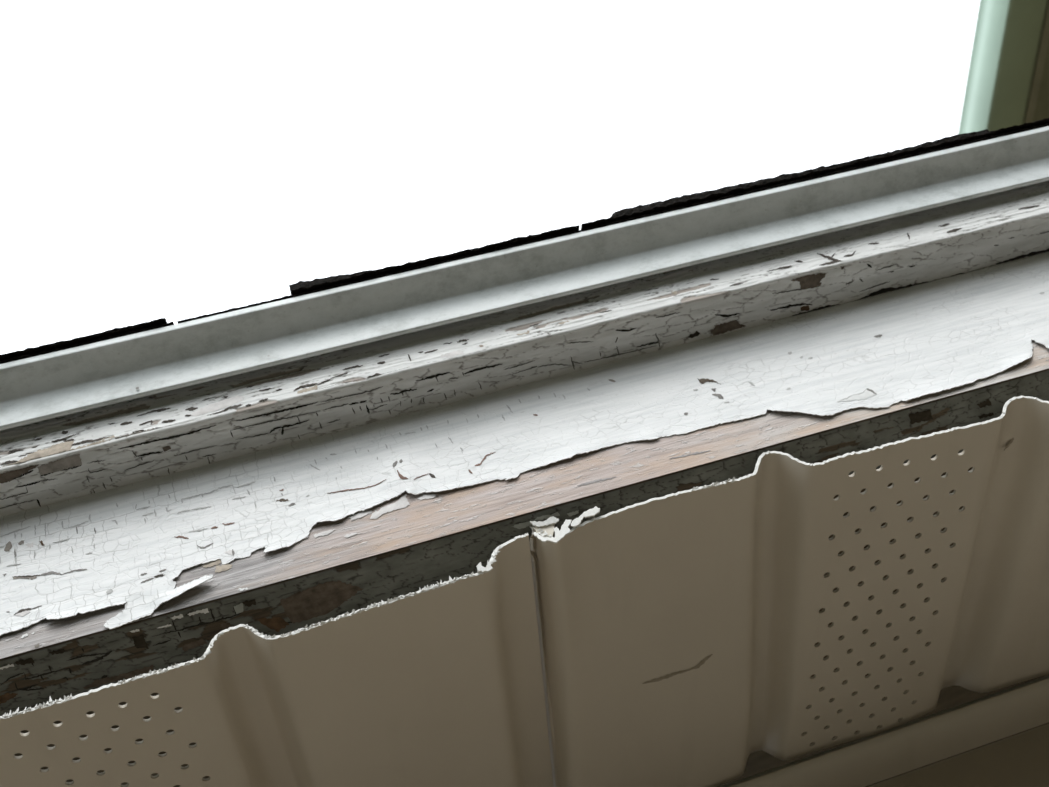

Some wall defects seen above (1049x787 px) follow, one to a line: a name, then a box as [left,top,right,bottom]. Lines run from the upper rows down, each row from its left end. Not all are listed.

peeling [791,273,826,289]
peeling [688,320,745,338]
crack [0,310,681,580]
peeling [0,341,1049,670]
crack [141,569,166,583]
peeling [83,665,154,689]